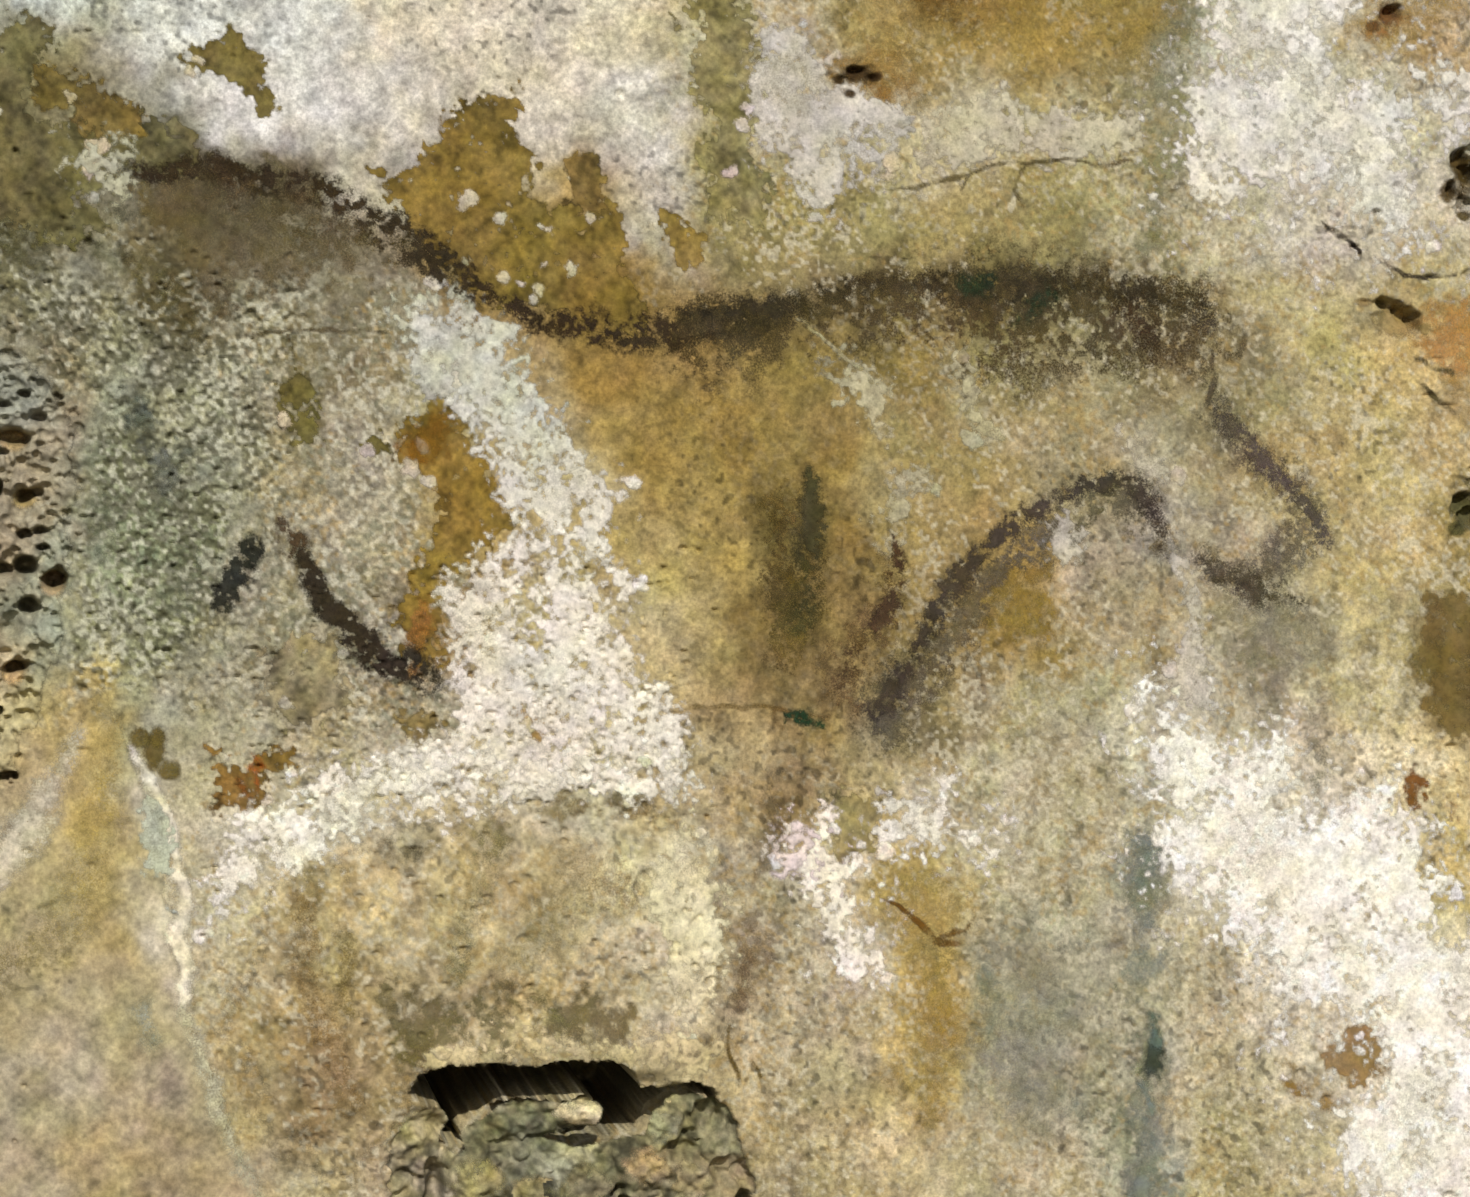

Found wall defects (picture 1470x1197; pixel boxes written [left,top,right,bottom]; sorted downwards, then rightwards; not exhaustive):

crack [902,157,1130,200]
corrosion [1283,1064,1305,1096]
corrosion [1319,1024,1383,1089]
spalling [386,1084,755,1197]